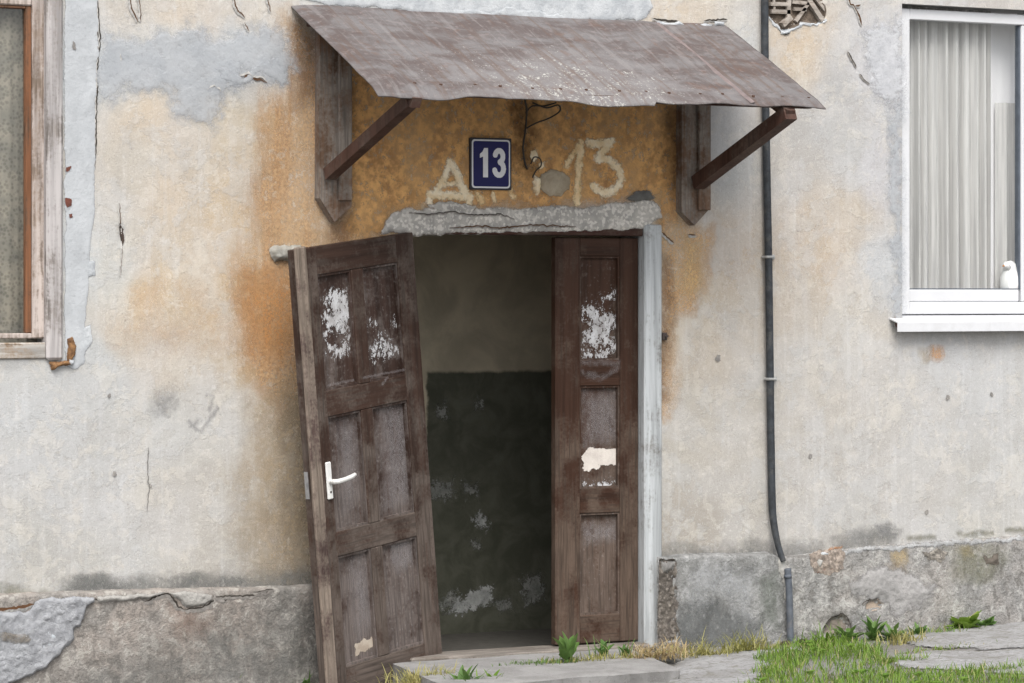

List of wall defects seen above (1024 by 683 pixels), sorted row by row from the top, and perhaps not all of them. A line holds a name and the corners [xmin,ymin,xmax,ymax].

crack [232,0,271,32]
spalling [769,0,827,35]
crack [848,0,862,26]
crack [847,52,869,85]
corrosion [238,24,322,411]
crack [409,211,576,230]
damp [66,415,308,591]
spalling [809,546,846,576]
crack [144,589,274,614]
spalling [657,558,680,646]
peeling [0,591,212,683]
spalling [823,613,851,634]